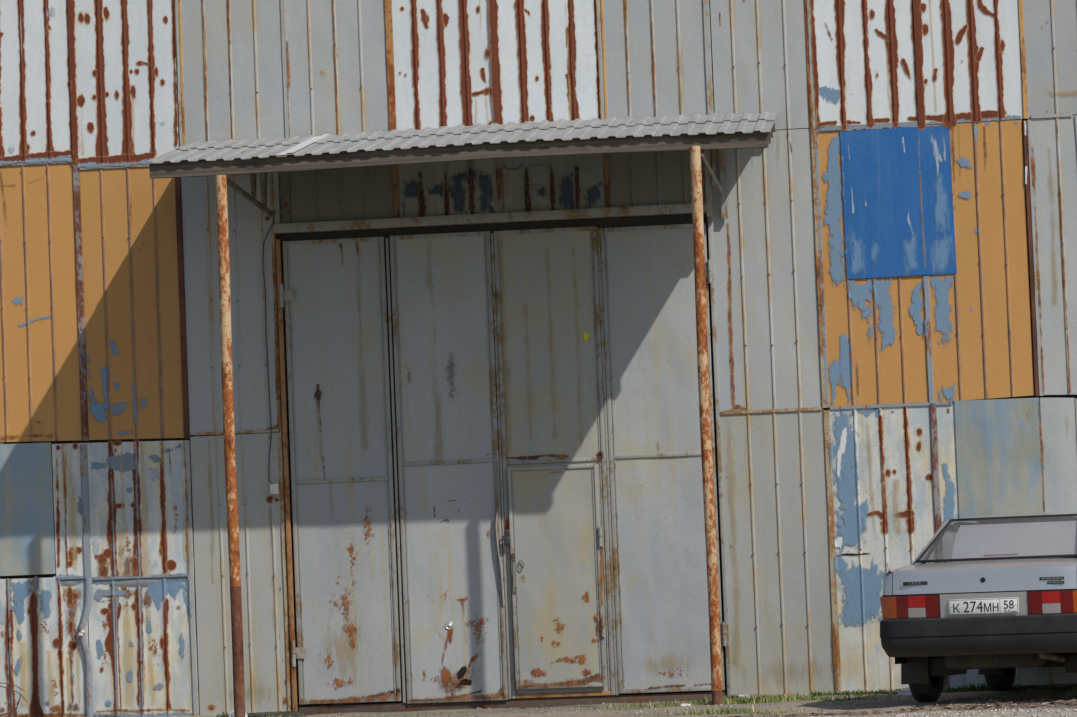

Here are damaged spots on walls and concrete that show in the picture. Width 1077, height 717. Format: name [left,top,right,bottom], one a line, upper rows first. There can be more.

rust [0,0,178,218]
rust [399,0,503,130]
rust [514,0,553,123]
rust [565,0,580,120]
rust [807,0,1006,193]
peeling [957,115,1026,140]
peeling [819,121,943,350]
peeling [909,275,954,344]
peeling [84,351,147,436]
peeling [828,334,890,627]
peeling [0,444,192,717]
rust [302,591,507,704]